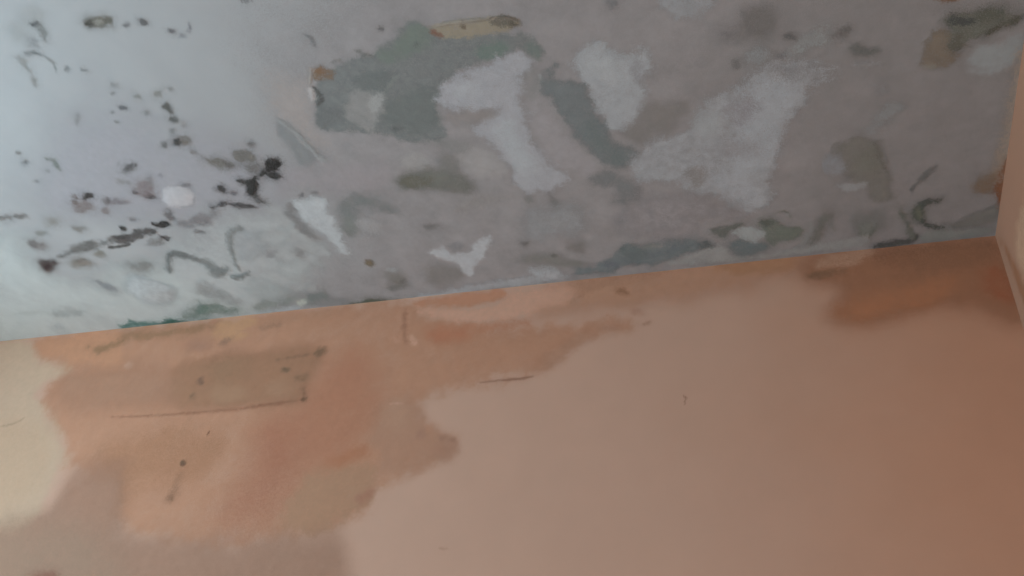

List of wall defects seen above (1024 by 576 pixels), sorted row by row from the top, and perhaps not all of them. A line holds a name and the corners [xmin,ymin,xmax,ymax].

spalling [305,13,546,145]
leakage [0,0,1024,375]